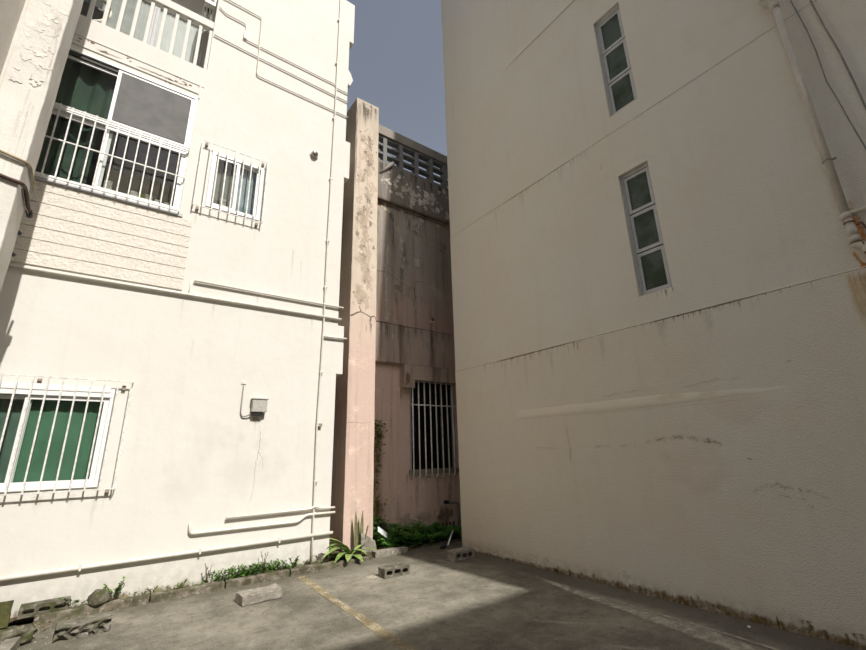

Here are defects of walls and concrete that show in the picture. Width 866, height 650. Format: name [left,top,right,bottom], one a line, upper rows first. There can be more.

peeling [352,131,450,309]
corrosion [843,216,866,268]
leakage [474,551,866,650]